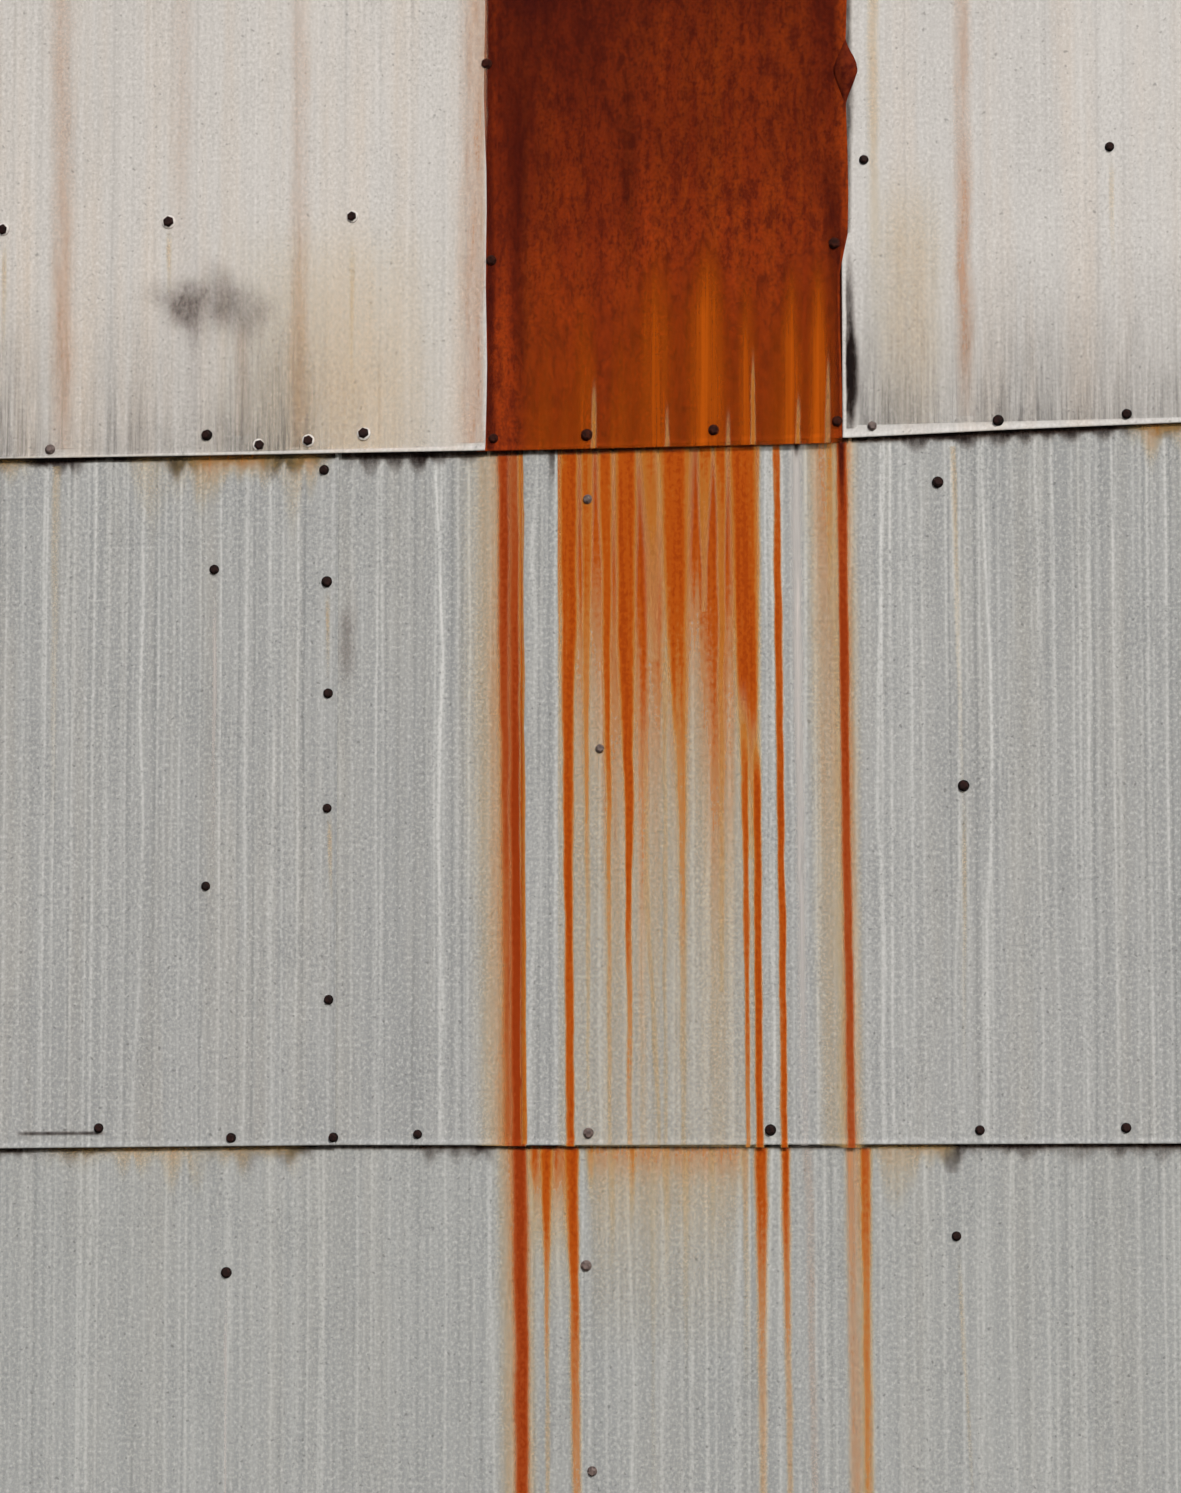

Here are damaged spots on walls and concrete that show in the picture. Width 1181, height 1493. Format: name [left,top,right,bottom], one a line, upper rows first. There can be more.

rust [496,262,871,1493]